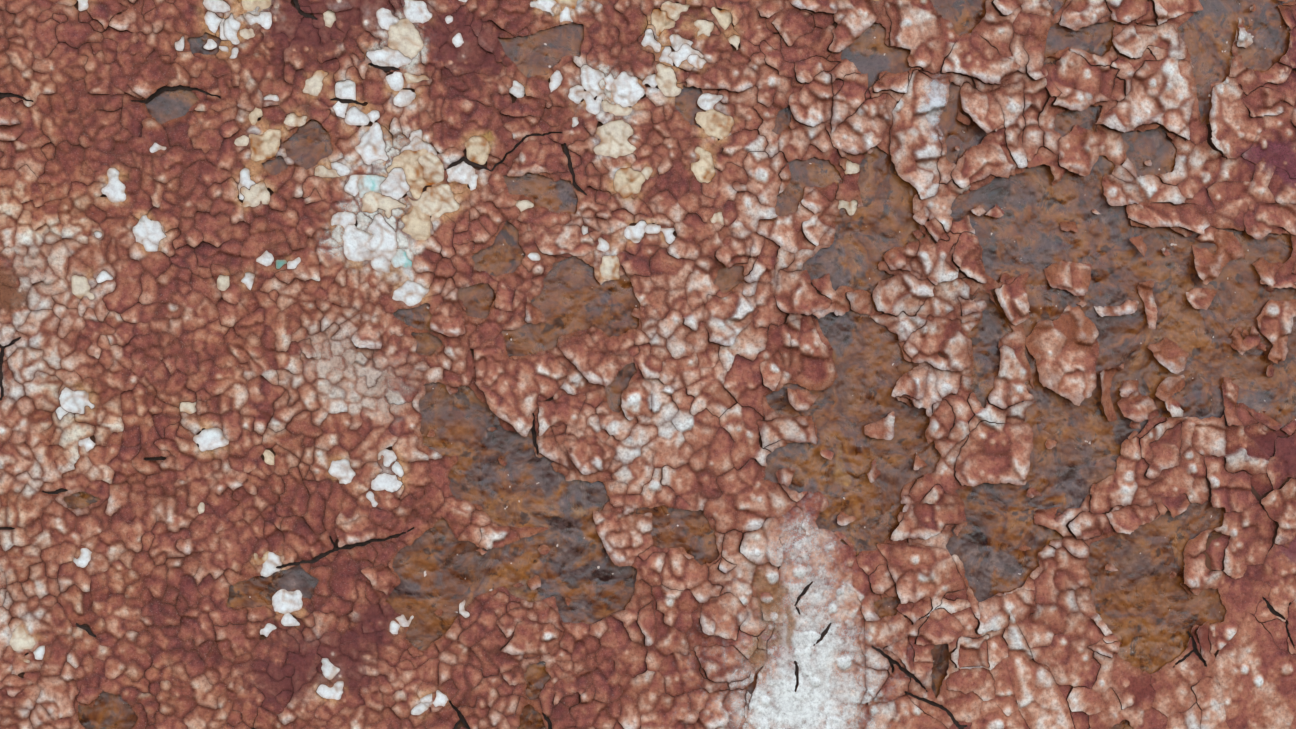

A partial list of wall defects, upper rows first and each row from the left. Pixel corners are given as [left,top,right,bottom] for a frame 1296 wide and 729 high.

crack [1116,0,1157,96]
spalling [101,168,126,203]
spalling [133,215,167,252]
crack [945,245,965,278]
crack [1242,70,1296,204]
crack [0,0,846,729]
peeling [193,120,778,729]
peeling [685,0,1296,729]
peeling [6,437,148,568]
crack [1243,478,1296,654]
peeling [0,625,160,729]
crack [851,590,1089,729]